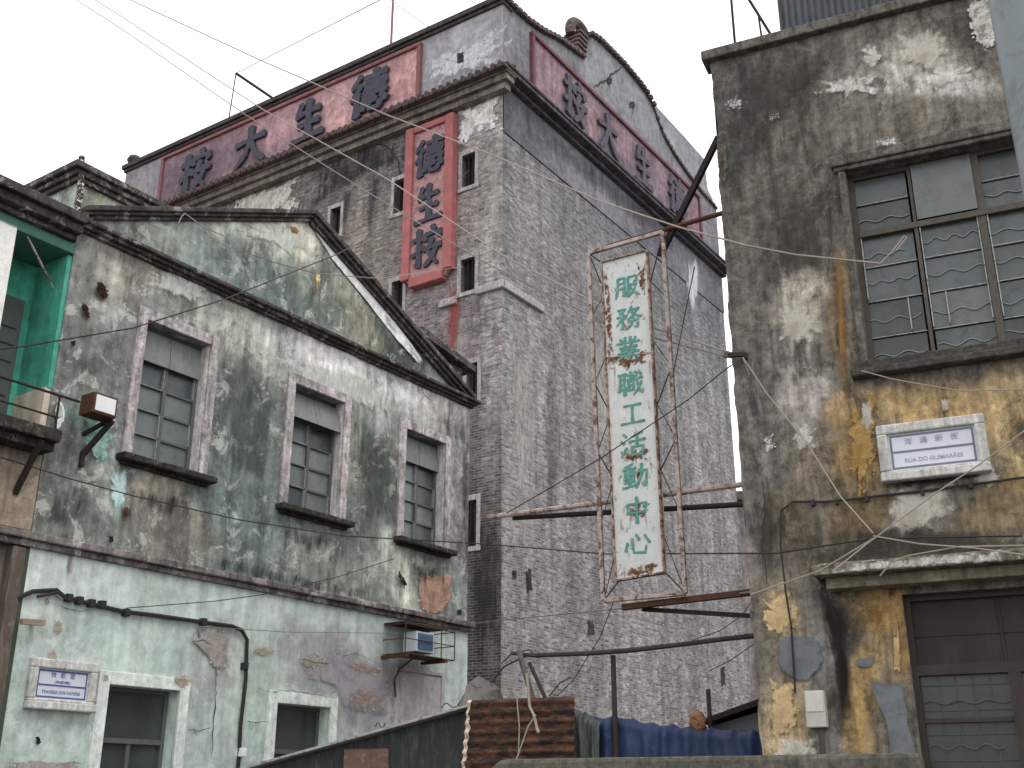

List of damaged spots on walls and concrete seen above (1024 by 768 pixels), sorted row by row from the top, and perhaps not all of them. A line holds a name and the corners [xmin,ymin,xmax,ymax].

flaking render [967,0,996,51]
leakage [898,30,972,86]
rust [603,275,646,371]
leakage [278,358,391,412]
peeling [848,390,876,497]
leakage [222,560,337,593]
flaking render [419,573,453,613]
rust [618,563,657,576]
peeling [763,591,799,637]
peeling [190,626,228,751]
peeling [769,678,817,755]